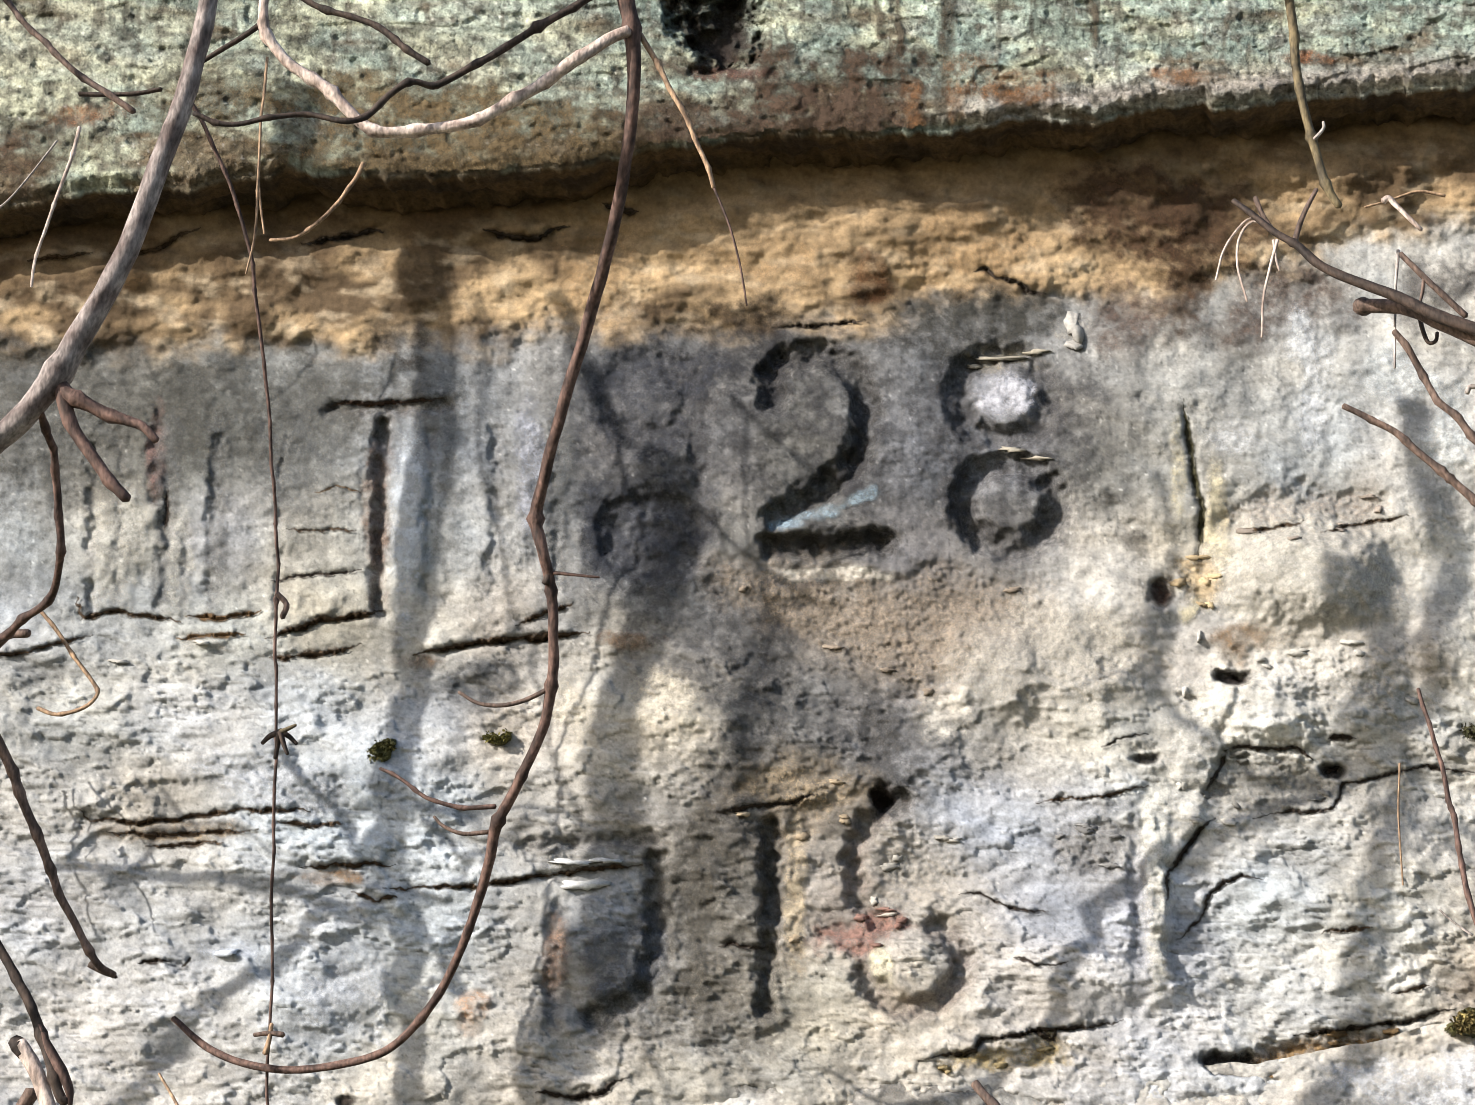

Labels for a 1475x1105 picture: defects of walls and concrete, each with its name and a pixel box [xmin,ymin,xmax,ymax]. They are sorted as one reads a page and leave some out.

crack [1165,734,1474,939]
crack [918,1019,1124,1062]